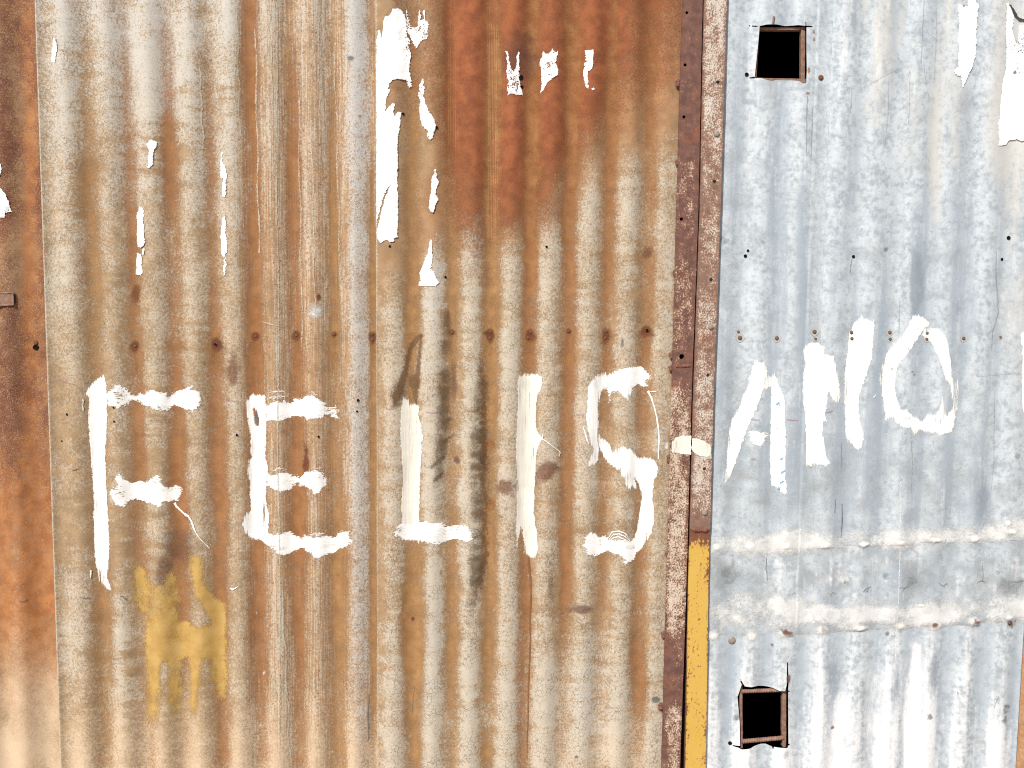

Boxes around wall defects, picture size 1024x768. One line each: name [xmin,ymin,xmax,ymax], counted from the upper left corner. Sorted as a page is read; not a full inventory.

rust [122,37,147,482]
rust [132,34,191,624]
rust [205,0,265,656]
rust [248,538,270,767]
rust [284,48,305,402]
rust [287,416,309,766]
rust [324,22,349,768]
rust [368,171,378,751]
damp [391,334,422,407]
rust [397,541,427,768]
damp [431,366,489,605]
rust [401,0,681,768]